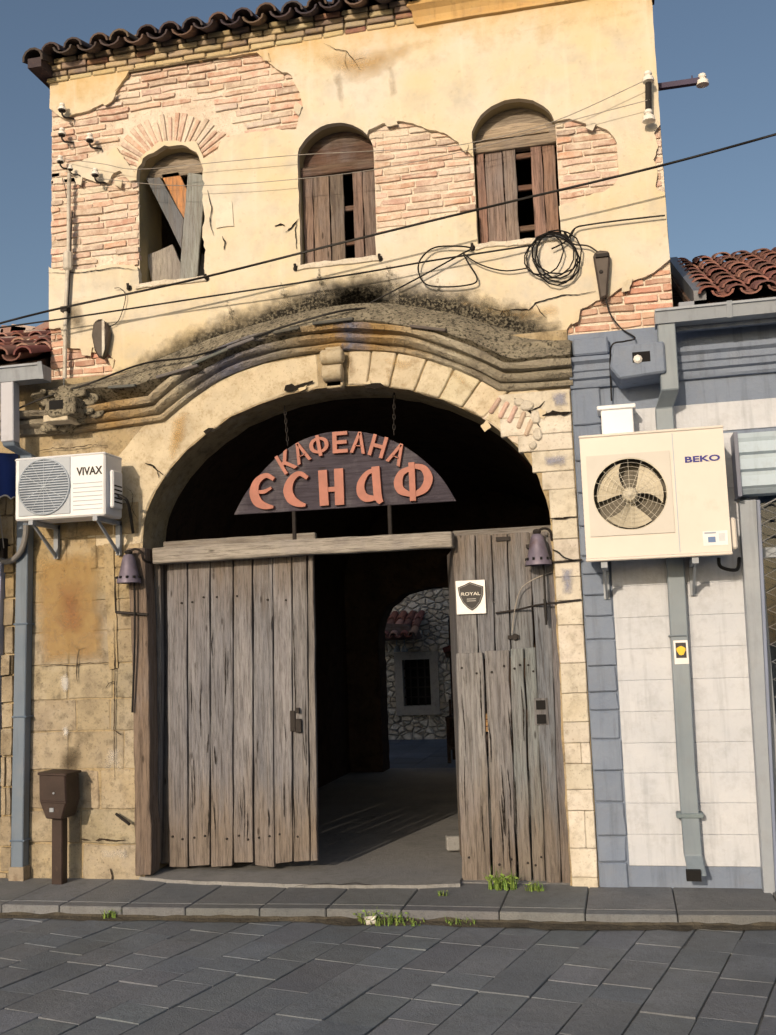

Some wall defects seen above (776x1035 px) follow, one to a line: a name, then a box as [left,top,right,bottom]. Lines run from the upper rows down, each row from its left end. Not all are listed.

flaking render [51,49,302,271]
flaking render [363,117,476,233]
flaking render [555,120,619,205]
flaking render [50,329,115,380]
damp [140,266,555,366]
flaking render [567,261,673,335]
flaking render [481,397,546,450]